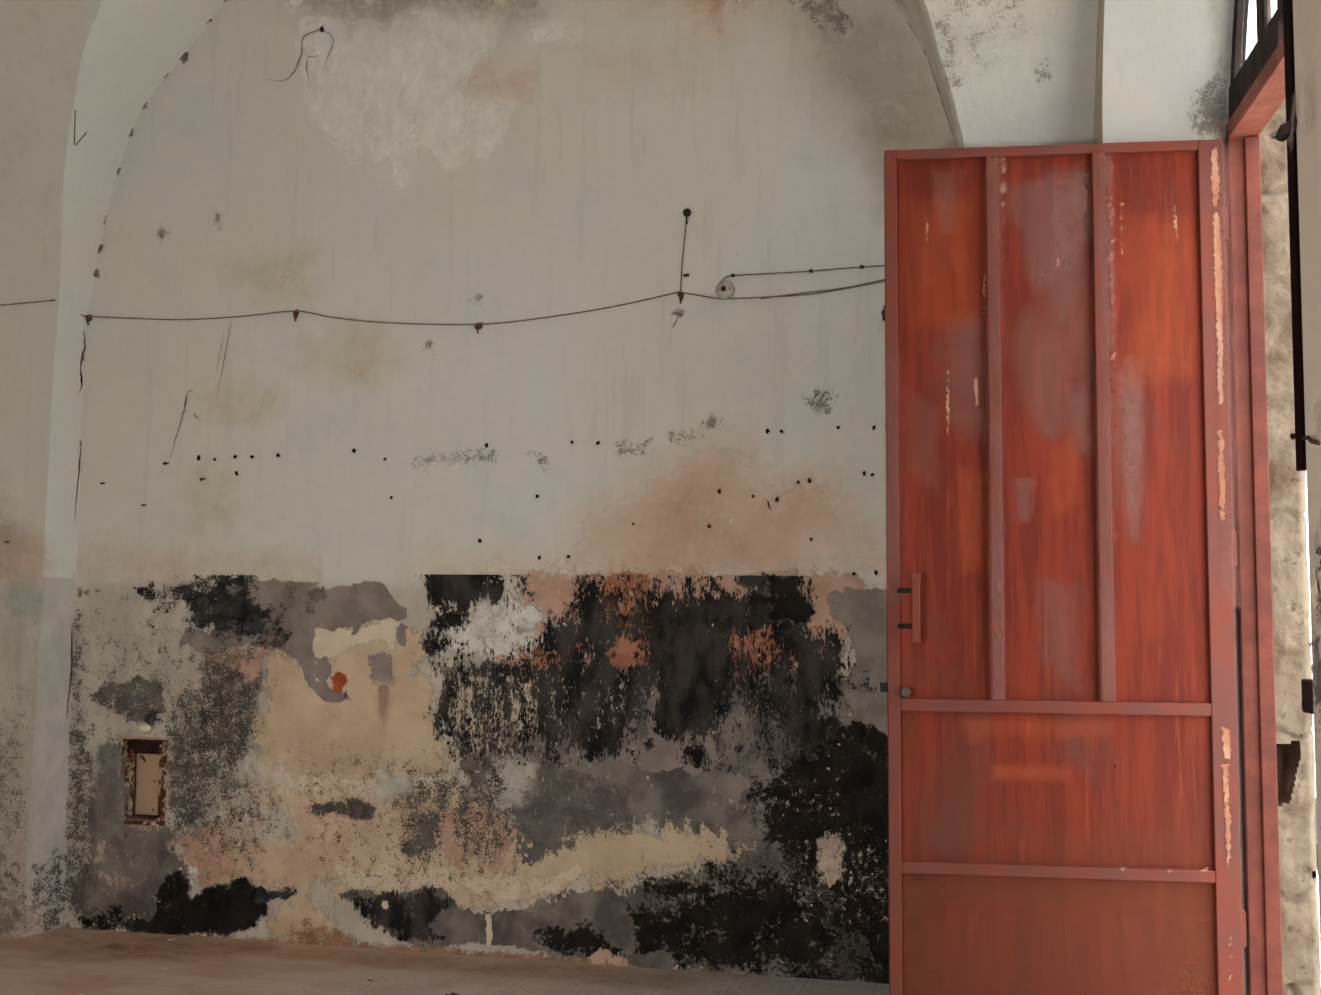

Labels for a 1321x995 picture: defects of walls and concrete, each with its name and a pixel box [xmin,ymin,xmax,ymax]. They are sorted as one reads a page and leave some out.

peeling [411,448,499,469]
peeling [617,439,651,456]
leakage [429,592,566,665]
leakage [377,679,389,723]
leakage [0,575,294,937]
flaking render [77,562,889,969]
leakage [489,762,534,802]